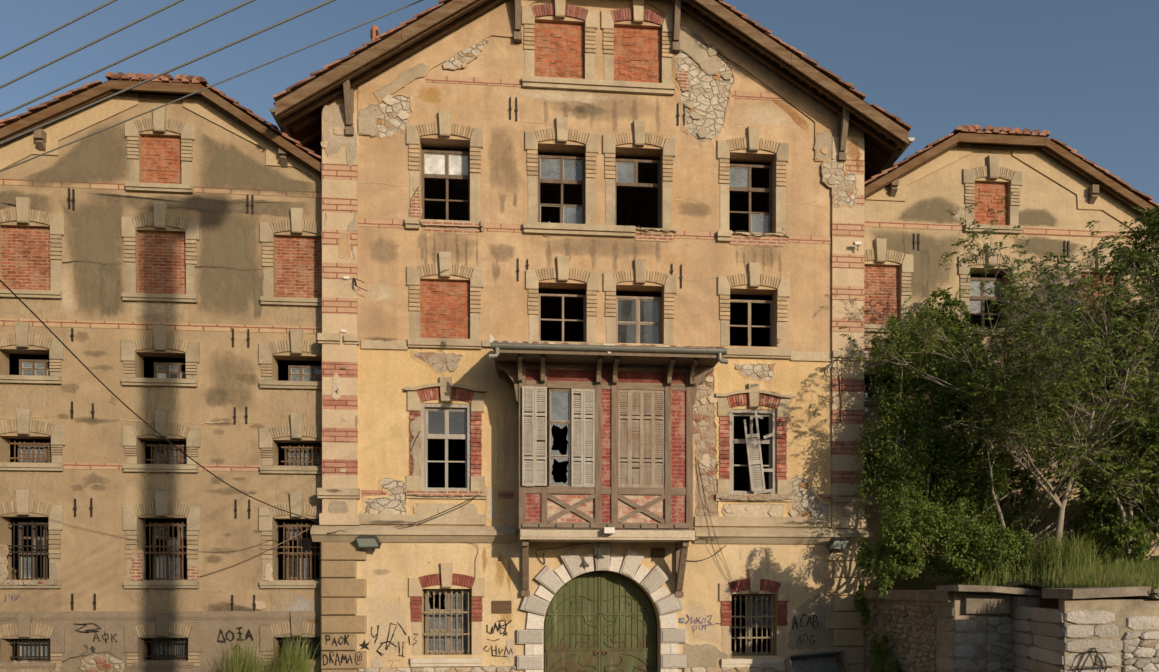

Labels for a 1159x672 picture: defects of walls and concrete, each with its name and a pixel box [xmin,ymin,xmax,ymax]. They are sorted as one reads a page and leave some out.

flaking render [671,24,739,148]
flaking render [320,93,417,166]
flaking render [814,130,858,208]
water stain [0,129,308,316]
water stain [0,298,47,320]
flaking render [410,348,467,376]
flaking render [734,360,778,384]
flaking render [693,370,787,523]
water stain [5,472,57,498]
flaking render [329,474,514,525]